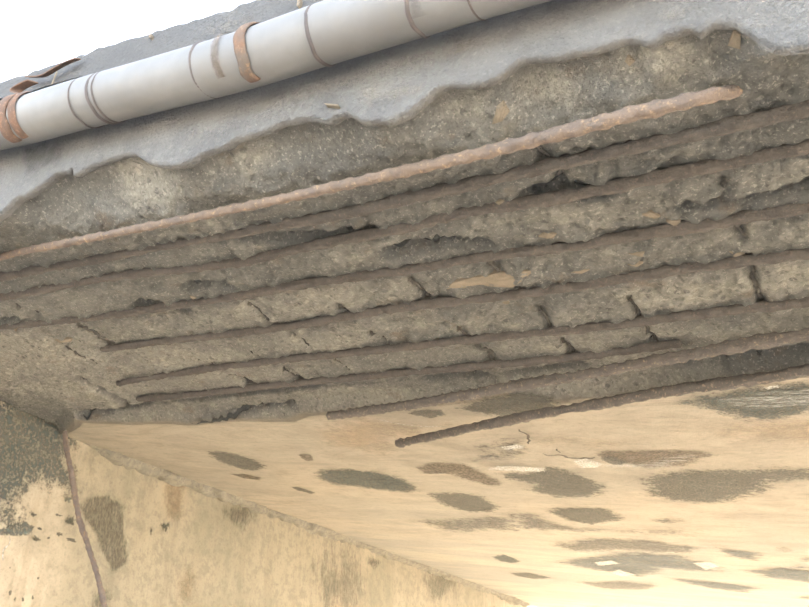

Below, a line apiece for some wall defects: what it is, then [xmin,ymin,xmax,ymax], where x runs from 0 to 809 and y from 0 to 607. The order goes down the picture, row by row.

spalling [0,30,809,435]
damp [0,400,77,560]
damp [208,451,265,480]
damp [317,469,416,493]
damp [418,443,809,503]
damp [83,497,127,570]
damp [425,493,720,590]
damp [676,579,756,593]
damp [725,551,762,559]
damp [752,558,809,583]